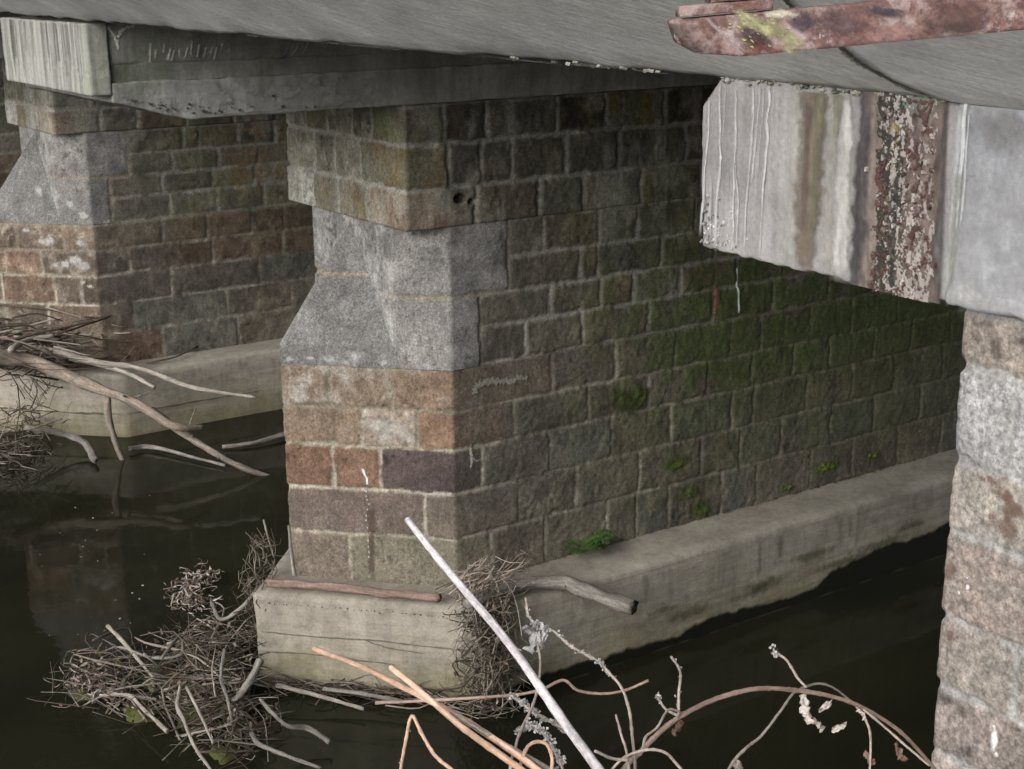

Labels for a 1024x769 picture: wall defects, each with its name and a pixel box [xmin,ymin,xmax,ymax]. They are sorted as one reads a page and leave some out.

damp [700,83,771,248]
spalling [720,77,910,98]
damp [781,92,853,274]
rust [849,91,948,304]
damp [503,522,950,702]